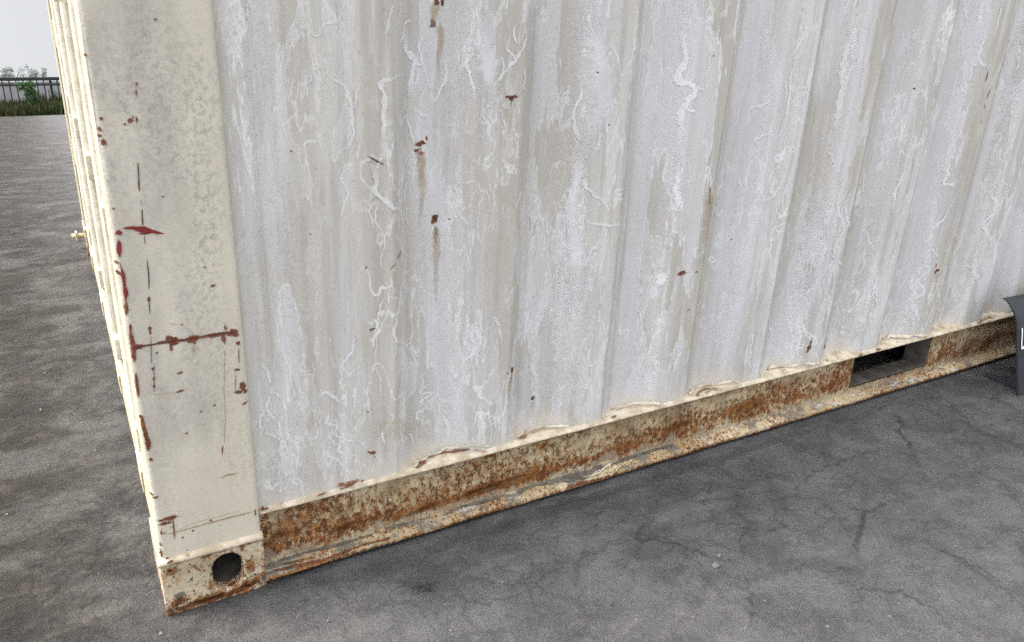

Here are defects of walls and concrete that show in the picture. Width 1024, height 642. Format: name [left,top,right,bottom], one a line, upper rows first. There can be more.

corrosion [430,0,444,38]
corrosion [414,136,428,173]
corrosion [722,397,767,416]
corrosion [557,455,598,469]
corrosion [240,510,370,548]
corrosion [159,530,391,613]